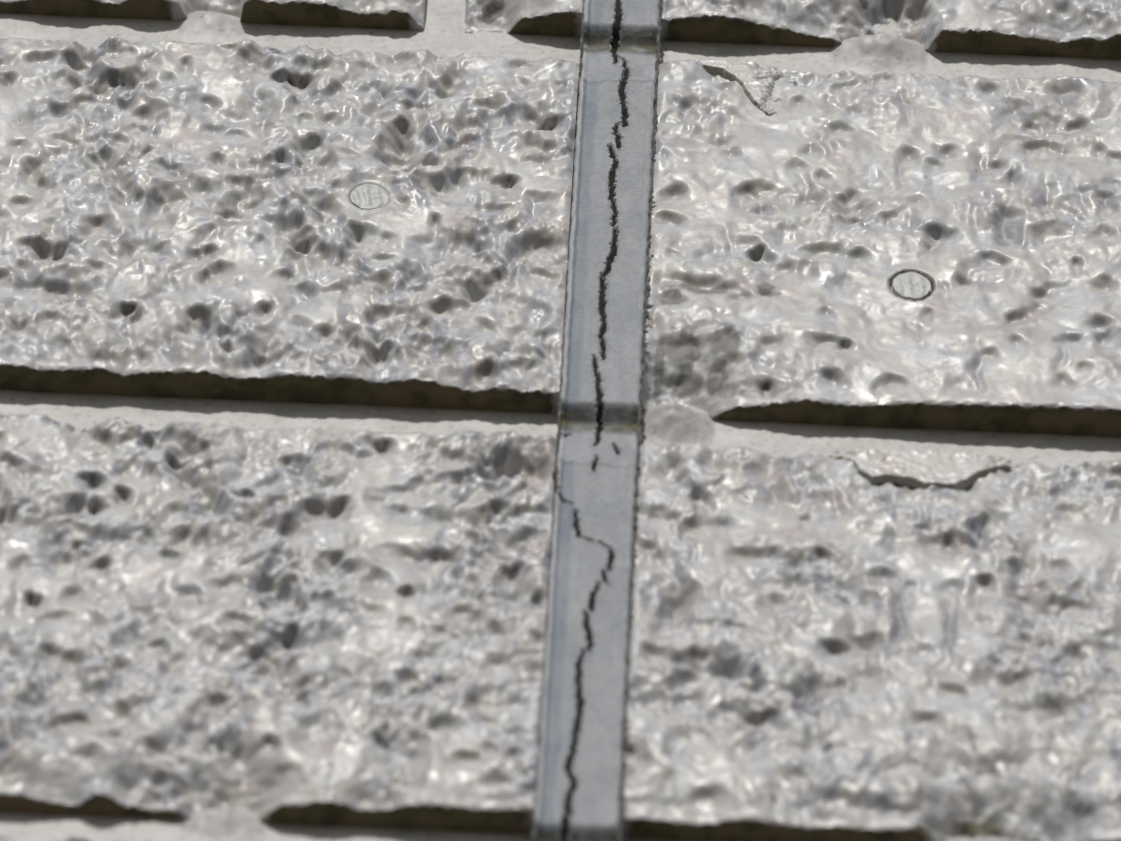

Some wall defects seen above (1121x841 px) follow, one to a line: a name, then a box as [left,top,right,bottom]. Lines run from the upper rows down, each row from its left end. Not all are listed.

crack [532,0,663,841]